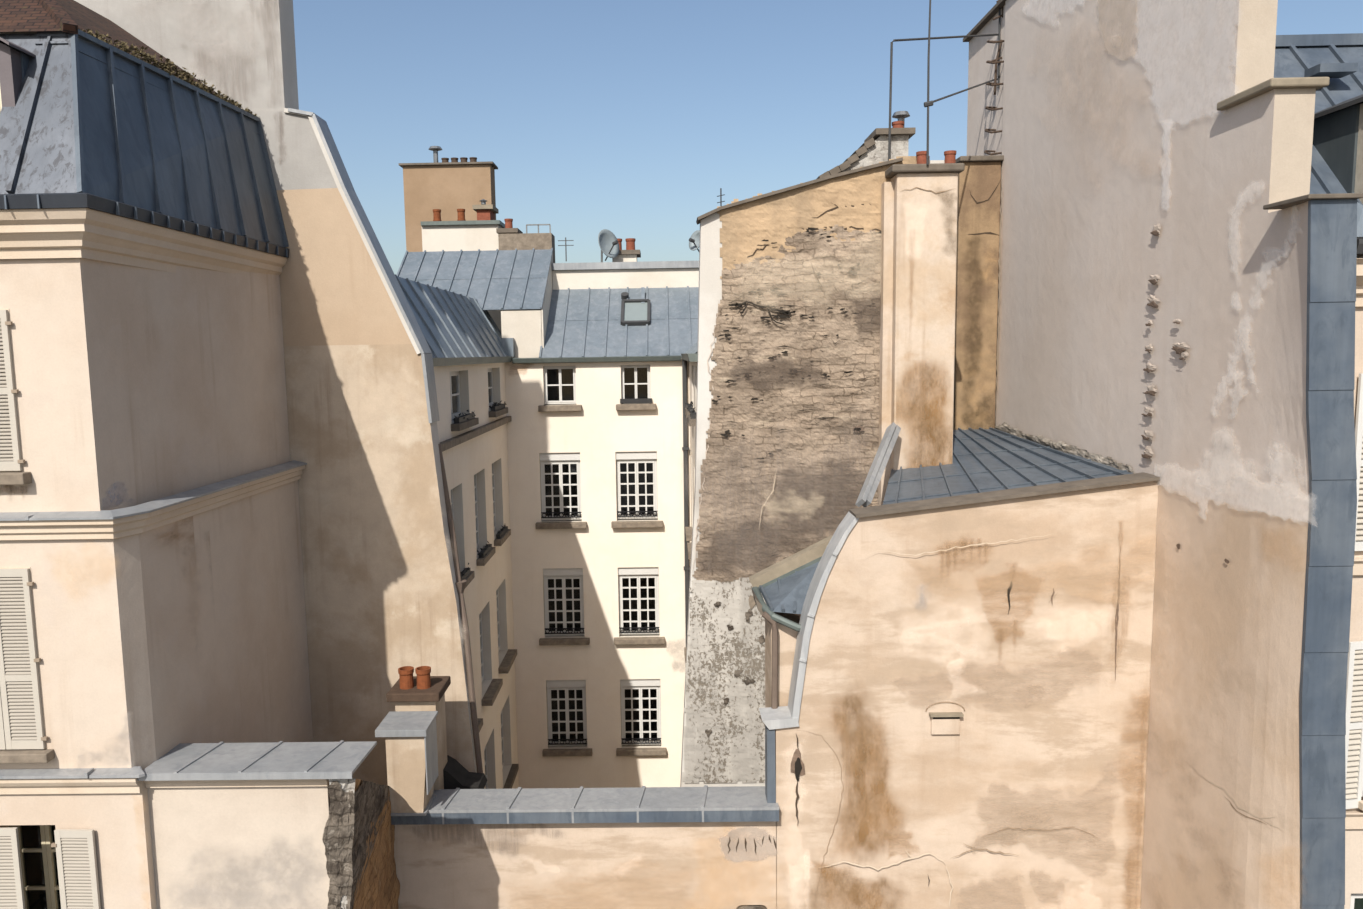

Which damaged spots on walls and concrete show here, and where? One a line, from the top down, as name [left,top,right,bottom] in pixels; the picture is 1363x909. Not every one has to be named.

leakage [903,369,952,468]
spalling [682,224,881,784]
crack [1005,580,1013,614]
crack [1114,546,1122,680]
leakage [835,700,908,850]
spalling [353,791,400,909]
flaking render [721,827,777,862]
leakage [820,866,886,909]